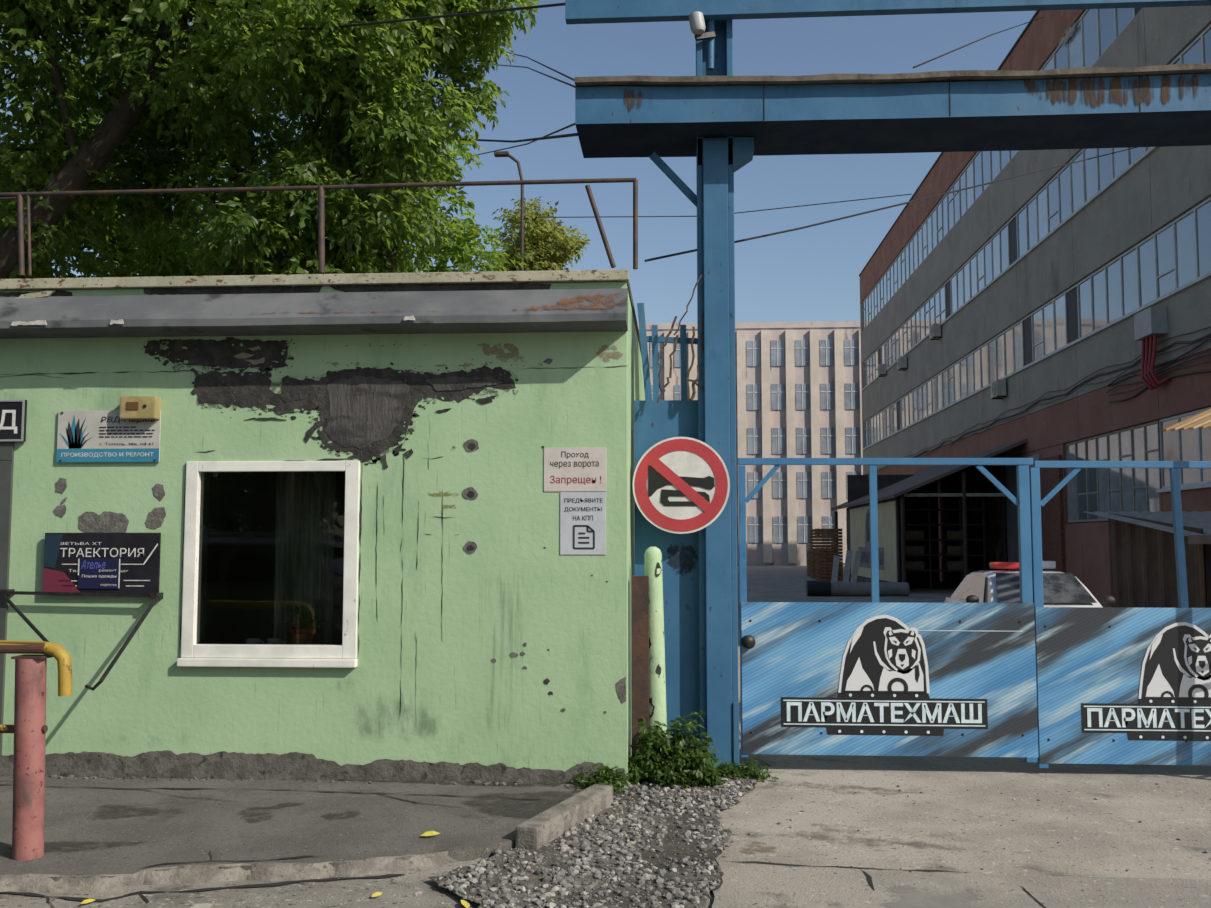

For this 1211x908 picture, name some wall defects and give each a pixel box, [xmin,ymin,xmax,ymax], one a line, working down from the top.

rust [624,89,642,111]
rust [1024,74,1198,108]
rust [515,292,617,310]
peeling [596,345,623,362]
flaking render [142,337,524,652]